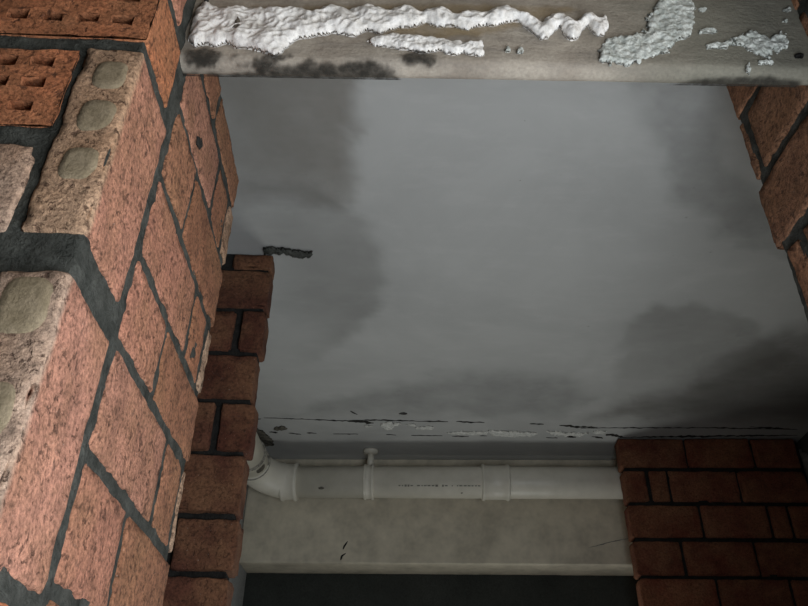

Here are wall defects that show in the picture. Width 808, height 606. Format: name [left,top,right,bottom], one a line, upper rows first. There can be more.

water stain [182,48,399,80]
water stain [403,50,436,67]
peeling [256,426,287,447]
peeling [447,429,607,438]